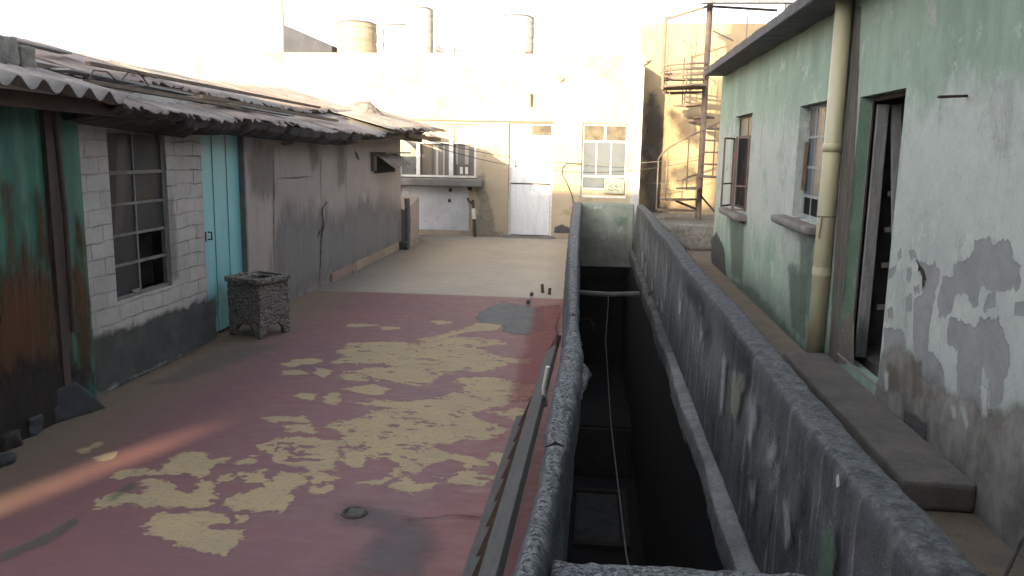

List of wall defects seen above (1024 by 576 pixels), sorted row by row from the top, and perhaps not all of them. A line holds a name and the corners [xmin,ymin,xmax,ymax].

corrosion [72,217,91,383]
peeling [75,441,118,461]
leakage [0,295,218,440]
crack [273,154,328,282]
peeling [91,320,535,556]
spalling [876,236,1024,561]